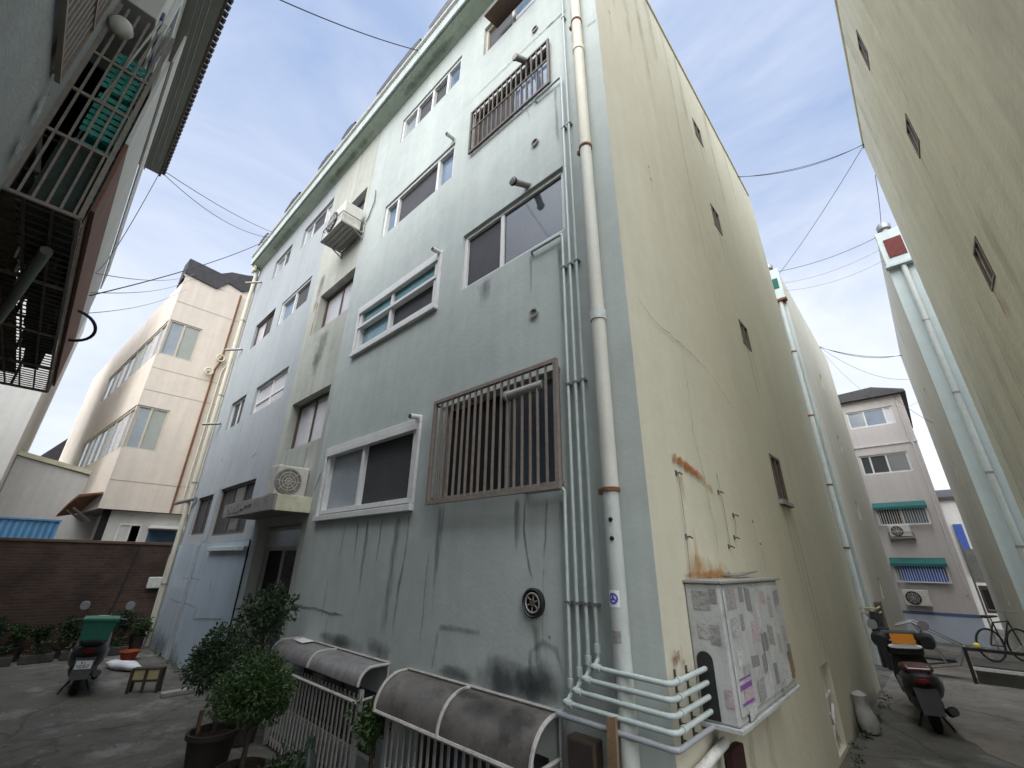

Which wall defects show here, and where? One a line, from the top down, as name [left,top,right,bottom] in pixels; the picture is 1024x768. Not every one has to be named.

corrosion [673,454,712,489]
corrosion [688,556,730,579]